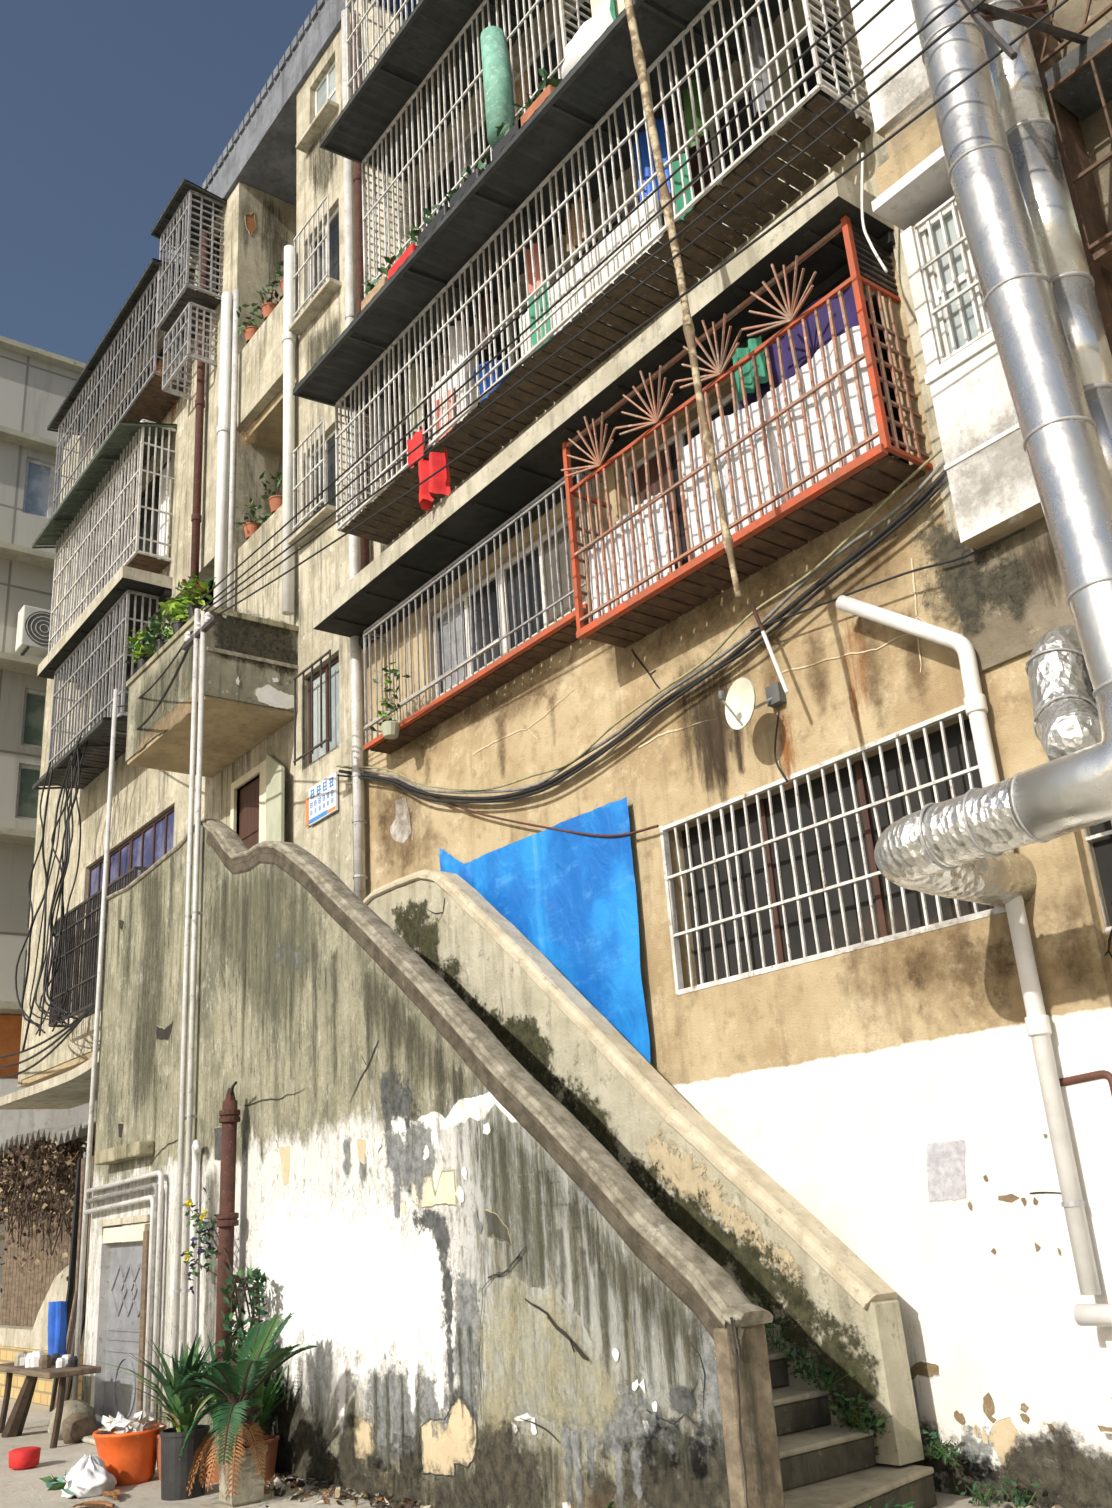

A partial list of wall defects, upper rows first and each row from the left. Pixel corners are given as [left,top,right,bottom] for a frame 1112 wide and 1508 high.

leakage [915,510,1060,633]
flaking render [236,676,297,710]
crack [631,648,660,689]
leakage [682,670,742,794]
leakage [907,644,924,688]
leakage [209,863,337,1067]
peeling [356,1092,518,1247]
leakage [264,953,730,1508]
crack [488,1247,589,1361]
peeling [351,1355,479,1481]
spalling [954,1391,1028,1471]
mould [909,1414,1112,1508]